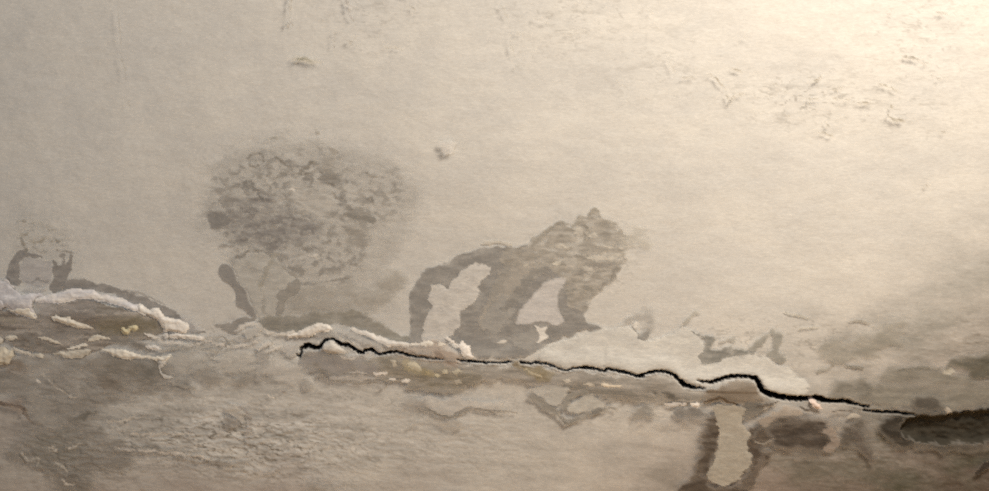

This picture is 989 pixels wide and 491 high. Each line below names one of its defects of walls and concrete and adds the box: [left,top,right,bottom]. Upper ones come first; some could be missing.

damp [6,220,205,334]
flaking render [0,277,822,419]
damp [207,136,650,359]
crack [297,338,914,464]
damp [673,324,903,491]
flaking render [872,367,989,454]